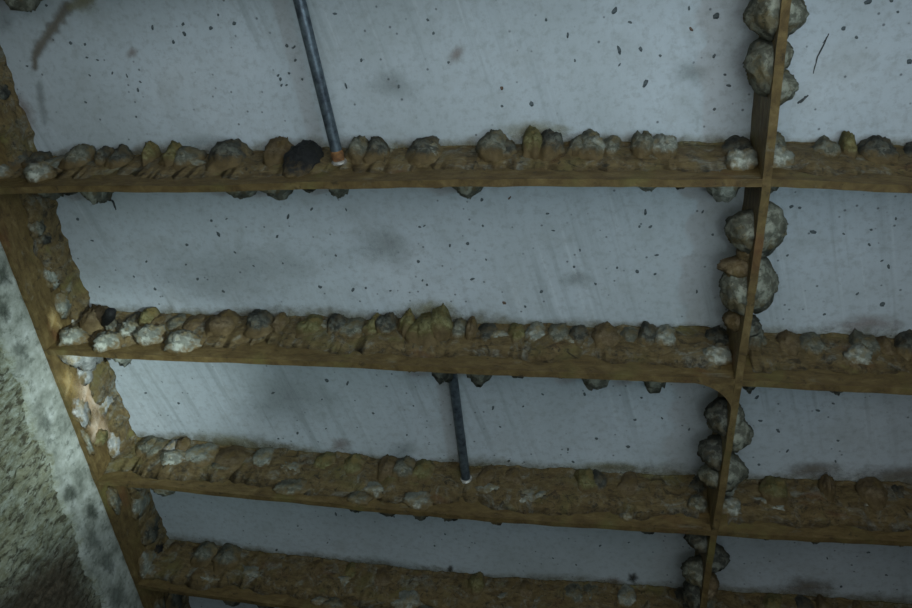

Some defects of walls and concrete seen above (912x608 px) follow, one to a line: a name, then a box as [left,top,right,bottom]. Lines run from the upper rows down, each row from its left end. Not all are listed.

water stain [33,3,71,69]